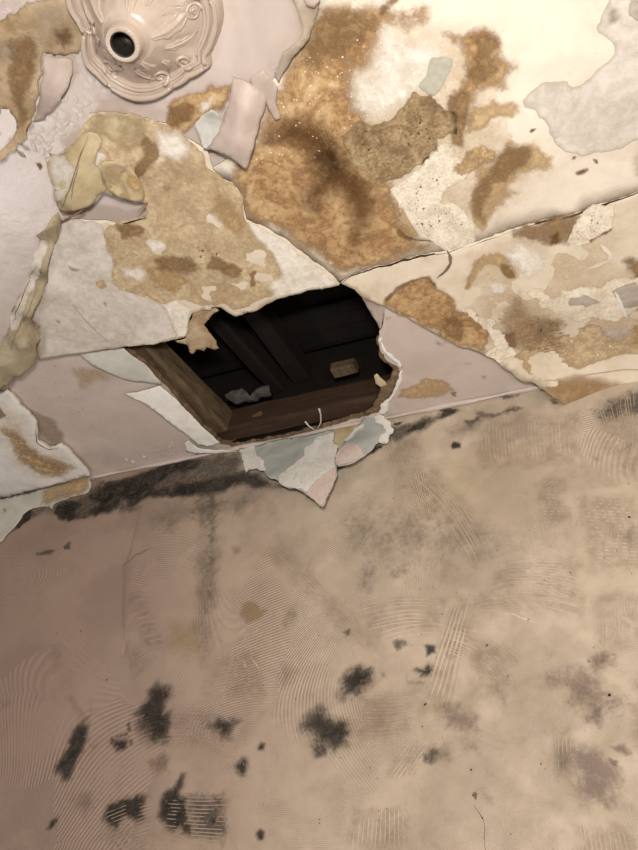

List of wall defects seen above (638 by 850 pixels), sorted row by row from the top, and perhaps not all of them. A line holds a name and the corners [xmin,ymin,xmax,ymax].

peeling [523,0,638,156]
damp [59,5,516,310]
damp [467,142,550,230]
crack [342,192,638,283]
peeling [0,131,402,507]
damp [385,277,489,350]
damp [466,253,638,404]
damp [370,408,456,453]
damp [54,454,271,521]
damp [56,724,87,779]
damp [104,796,145,826]
damp [159,775,225,836]